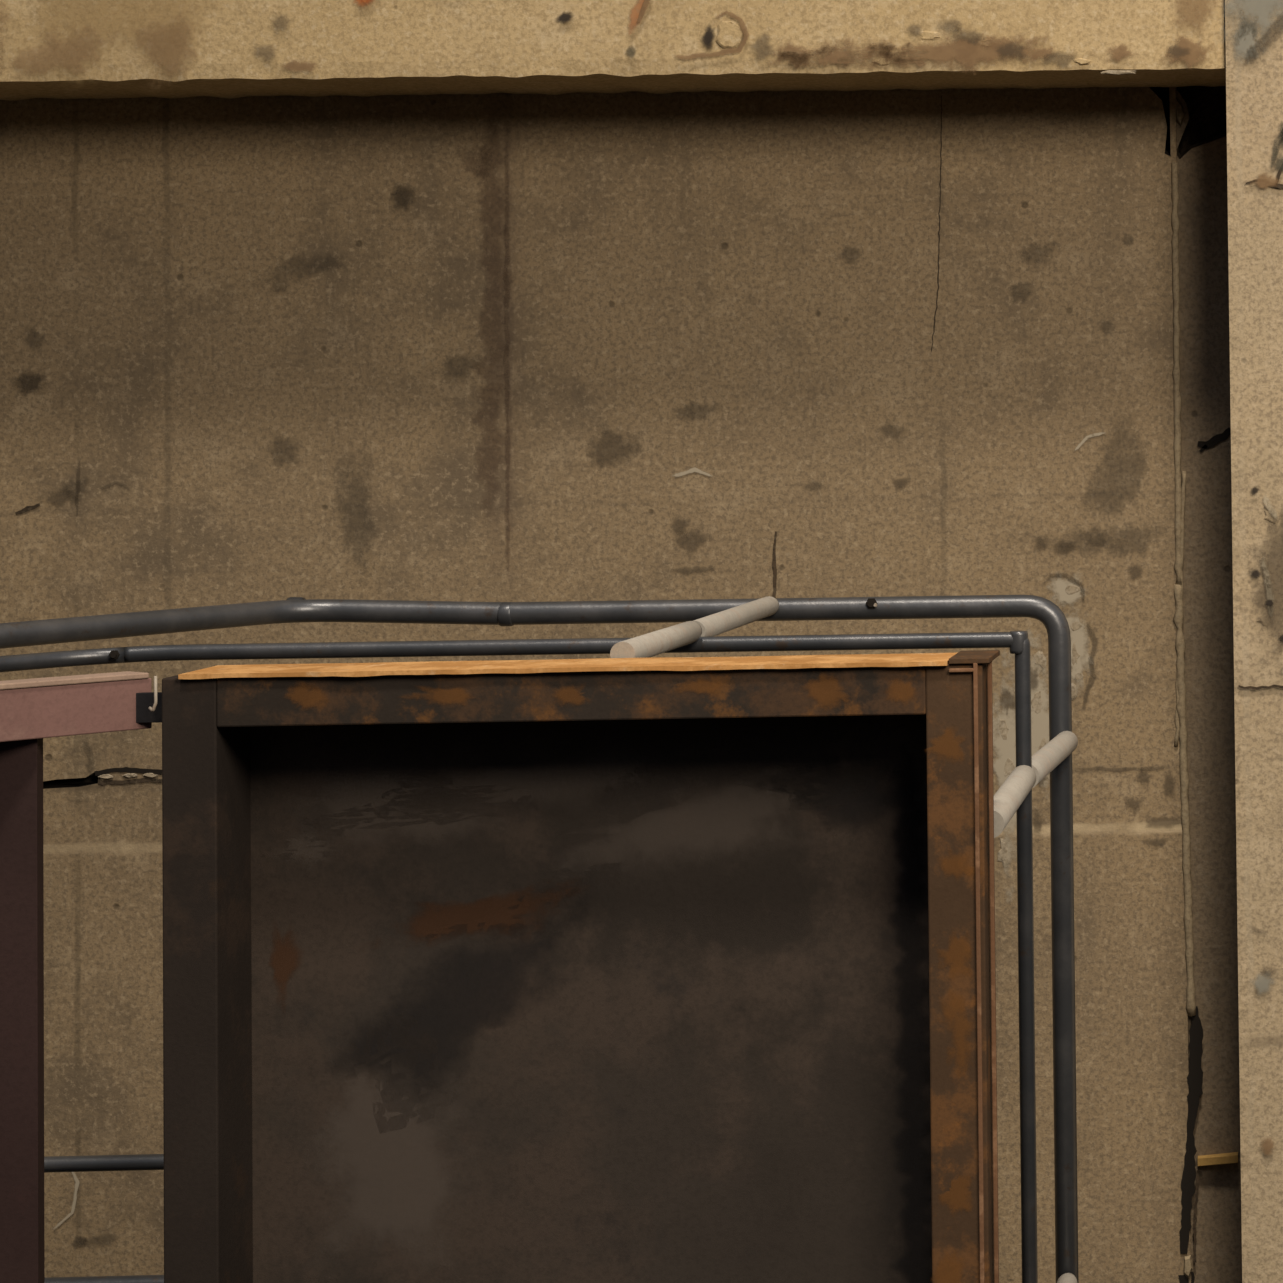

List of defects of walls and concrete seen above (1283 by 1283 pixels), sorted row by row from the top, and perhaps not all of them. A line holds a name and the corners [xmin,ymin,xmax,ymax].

spalling [1251,559,1274,626]
crack [1178,1006,1203,1283]